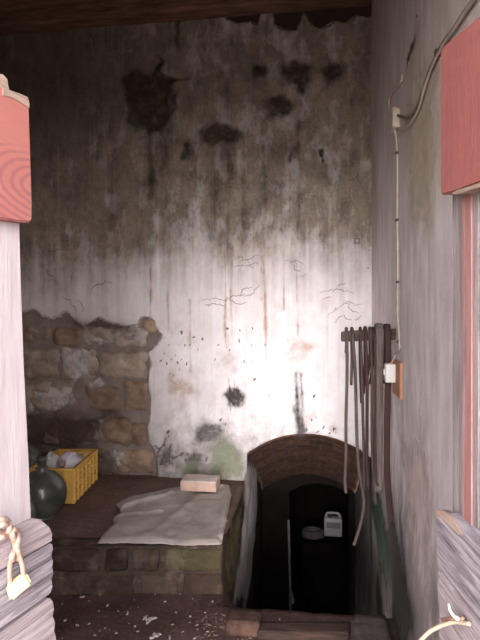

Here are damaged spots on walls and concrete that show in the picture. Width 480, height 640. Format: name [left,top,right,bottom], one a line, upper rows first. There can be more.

flaking render [224,14,261,26]
flaking render [273,3,372,32]
damp [282,61,310,95]
damp [122,58,178,160]
damp [270,96,292,116]
damp [199,123,243,144]
crack [204,285,260,306]
crack [320,283,361,323]
flaking render [22,308,187,476]
damp [224,387,244,407]
damp [293,385,306,434]
damp [196,424,222,441]